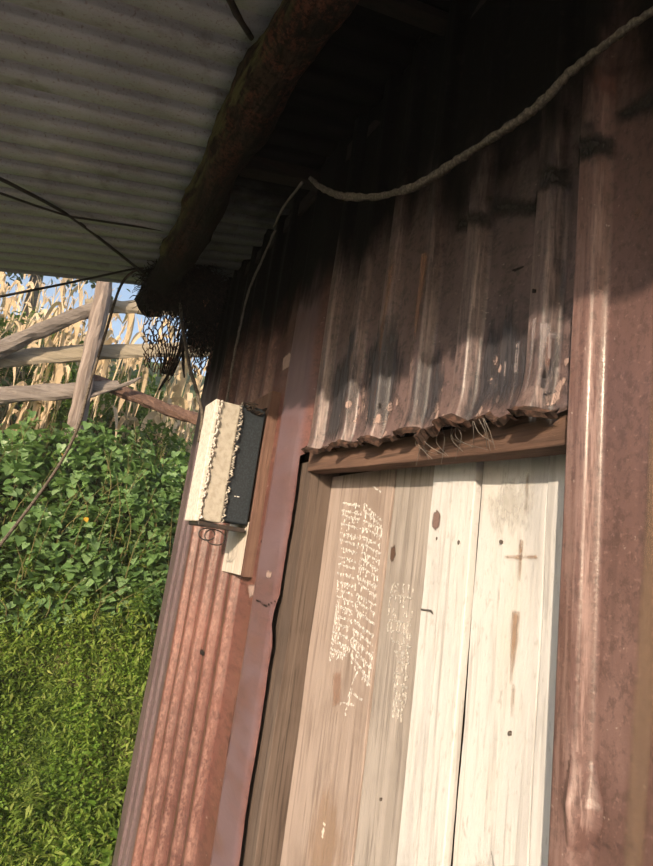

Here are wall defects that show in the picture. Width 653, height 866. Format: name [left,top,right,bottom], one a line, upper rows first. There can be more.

water stain [530,320,557,393]